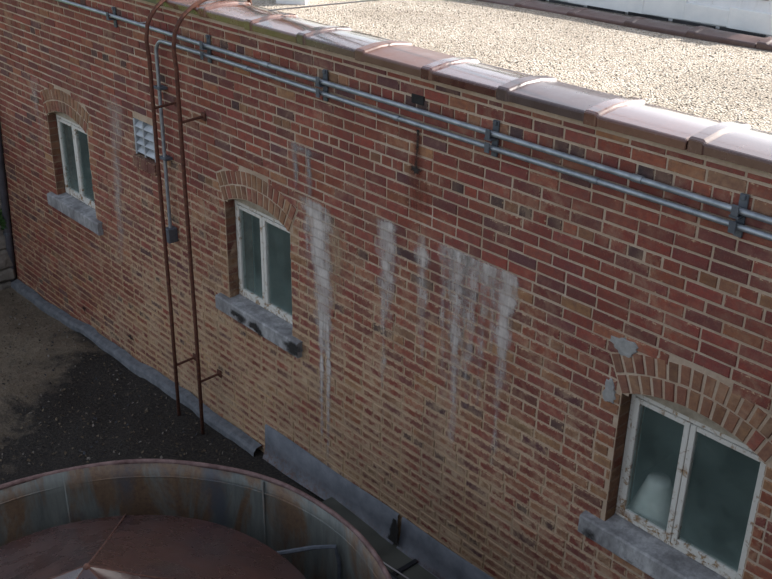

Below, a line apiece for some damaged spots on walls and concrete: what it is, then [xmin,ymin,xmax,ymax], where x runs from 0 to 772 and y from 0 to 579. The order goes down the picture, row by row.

water stain [304,200,340,415]
water stain [380,221,395,290]
water stain [442,247,517,358]